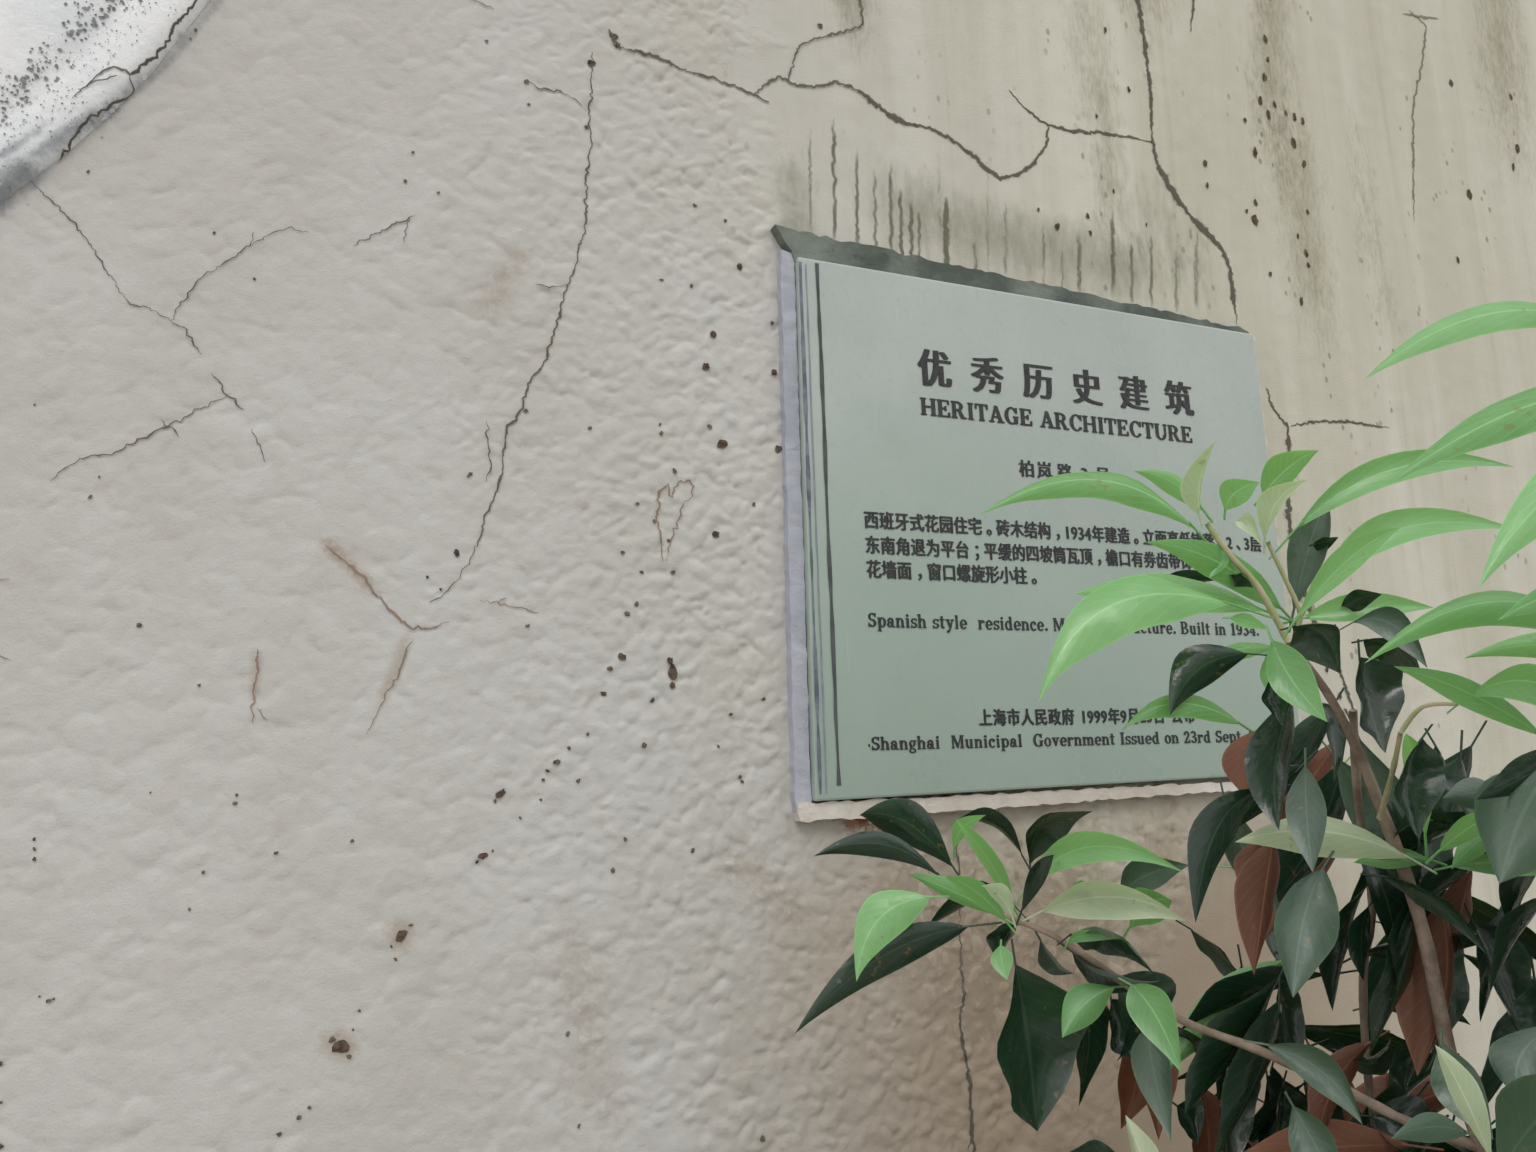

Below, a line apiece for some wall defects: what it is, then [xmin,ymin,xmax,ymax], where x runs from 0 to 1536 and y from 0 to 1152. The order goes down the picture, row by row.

damp [0,0,182,208]
crack [29,0,310,481]
crack [325,0,1237,732]
crack [1405,10,1438,214]